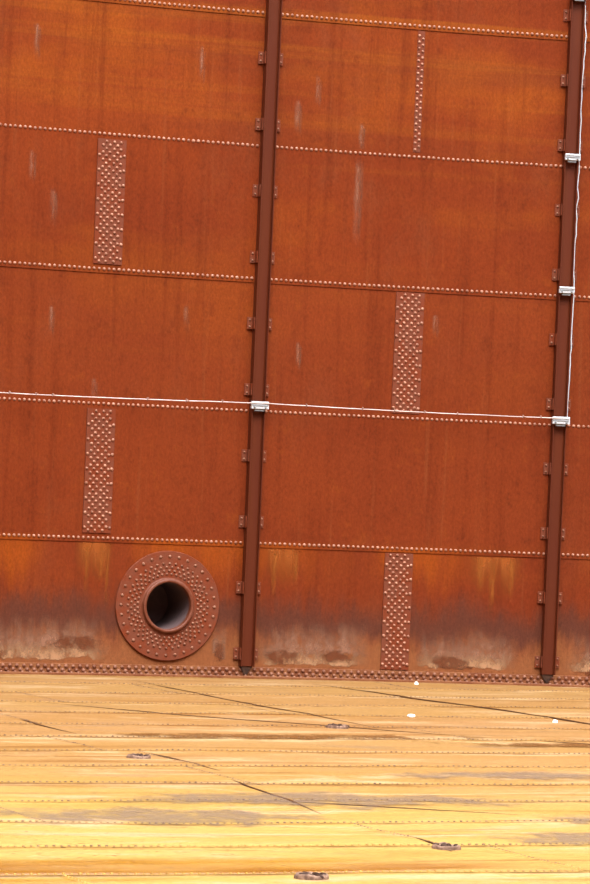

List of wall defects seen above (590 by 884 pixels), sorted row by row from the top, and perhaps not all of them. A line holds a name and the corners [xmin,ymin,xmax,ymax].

rust [477,557,515,594]
damp [0,629,94,660]
damp [266,632,358,667]
damp [423,642,506,671]